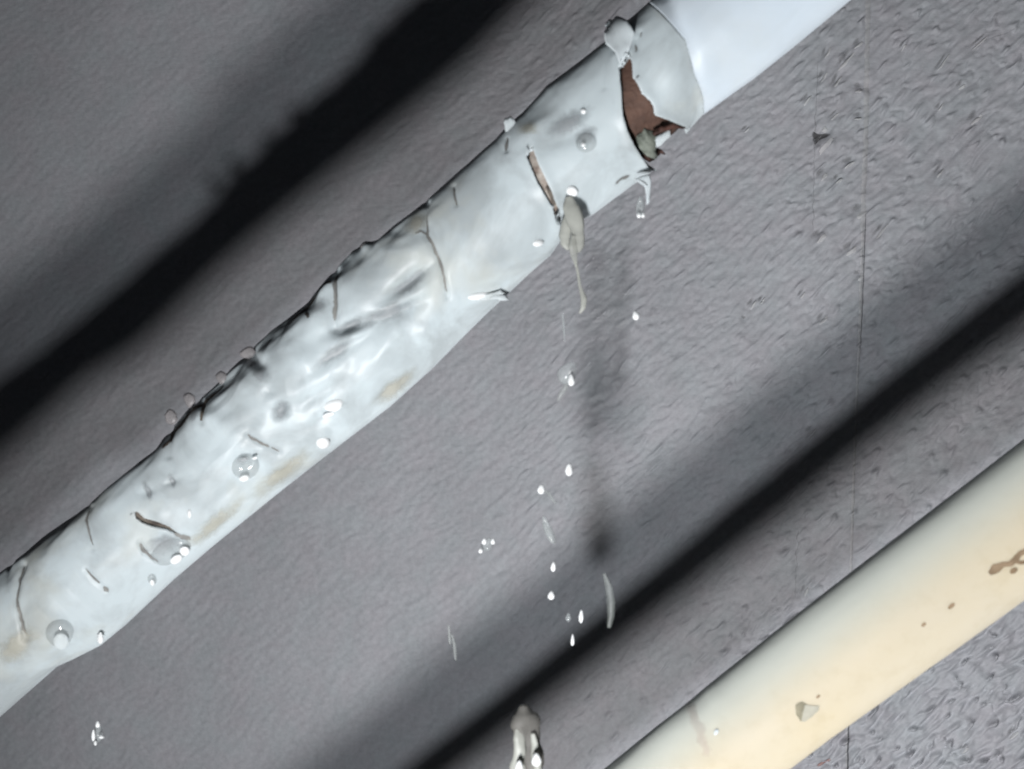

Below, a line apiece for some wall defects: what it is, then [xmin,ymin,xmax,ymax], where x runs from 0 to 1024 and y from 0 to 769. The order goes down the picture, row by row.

crack [505,138,557,216]
corrosion [988,549,1024,575]
peeling [795,702,819,722]